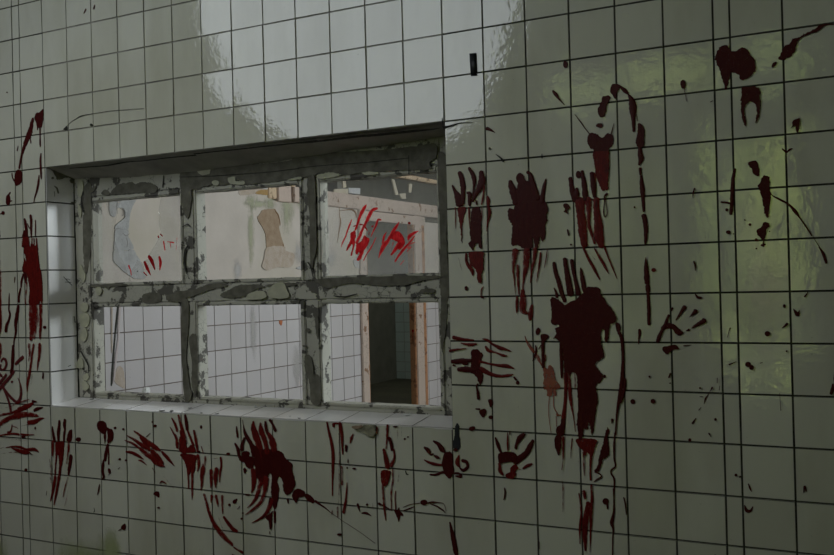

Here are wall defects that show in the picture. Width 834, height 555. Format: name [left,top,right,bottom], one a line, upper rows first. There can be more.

peeling [46,167,164,295]
peeling [179,143,449,353]
peeling [77,303,90,391]
peeling [142,282,297,403]
peeling [302,345,321,406]